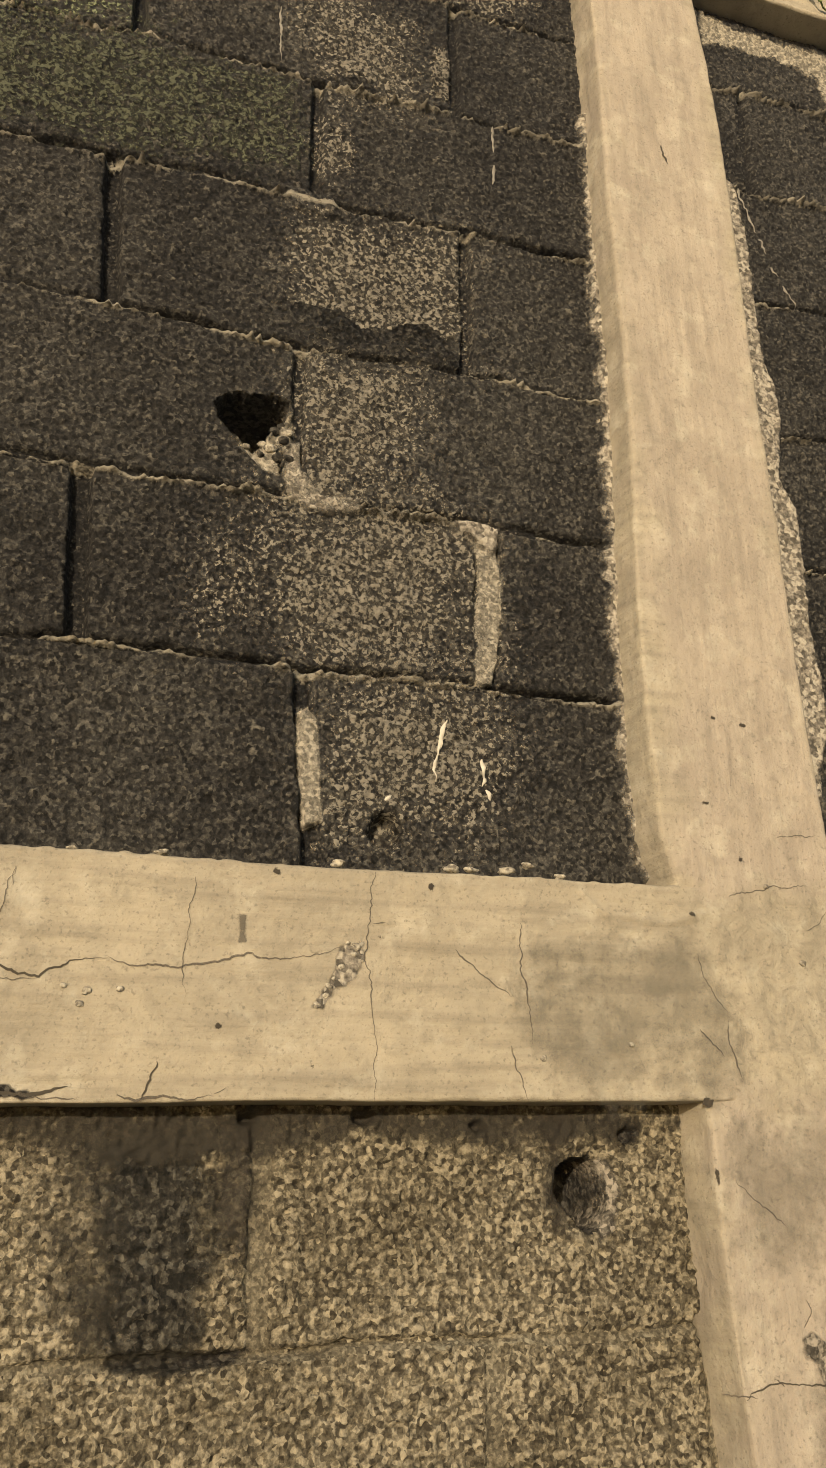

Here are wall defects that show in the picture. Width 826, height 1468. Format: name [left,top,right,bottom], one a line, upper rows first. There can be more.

crack [0,866,386,1102]
water stain [0,1104,640,1377]
crack [723,1300,826,1401]